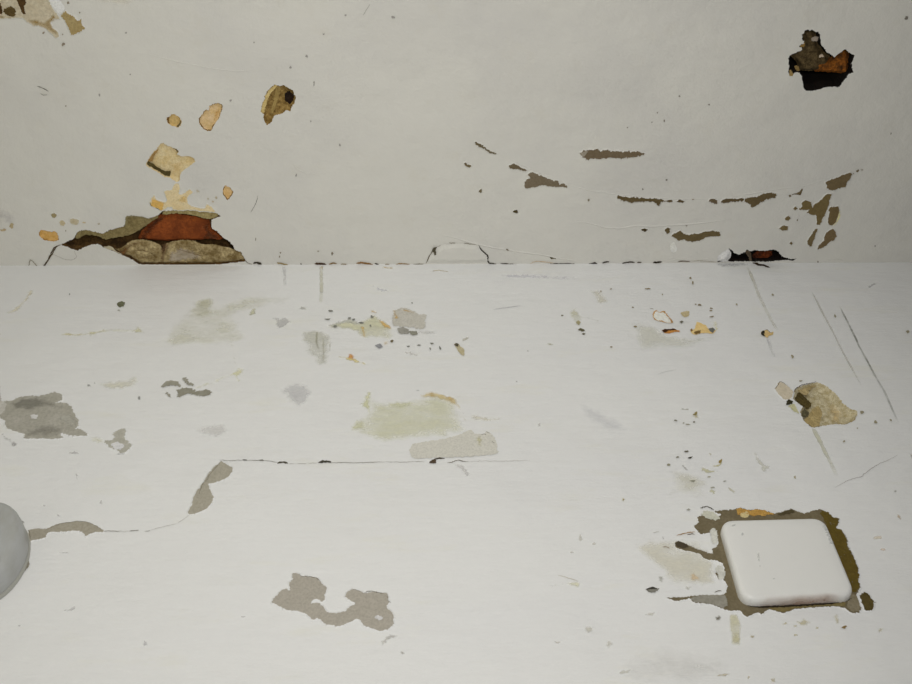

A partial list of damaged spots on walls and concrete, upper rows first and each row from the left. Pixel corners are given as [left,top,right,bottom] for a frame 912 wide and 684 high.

spalling [0,0,86,46]
peeling [579,147,646,161]
spalling [39,143,245,266]
peeling [615,188,694,207]
peeling [707,191,778,208]
peeling [778,169,863,250]
peeling [0,391,89,445]
spalling [774,380,864,429]
crack [224,457,373,465]
crack [409,456,487,464]
spalling [665,506,876,624]
peeling [270,572,396,639]